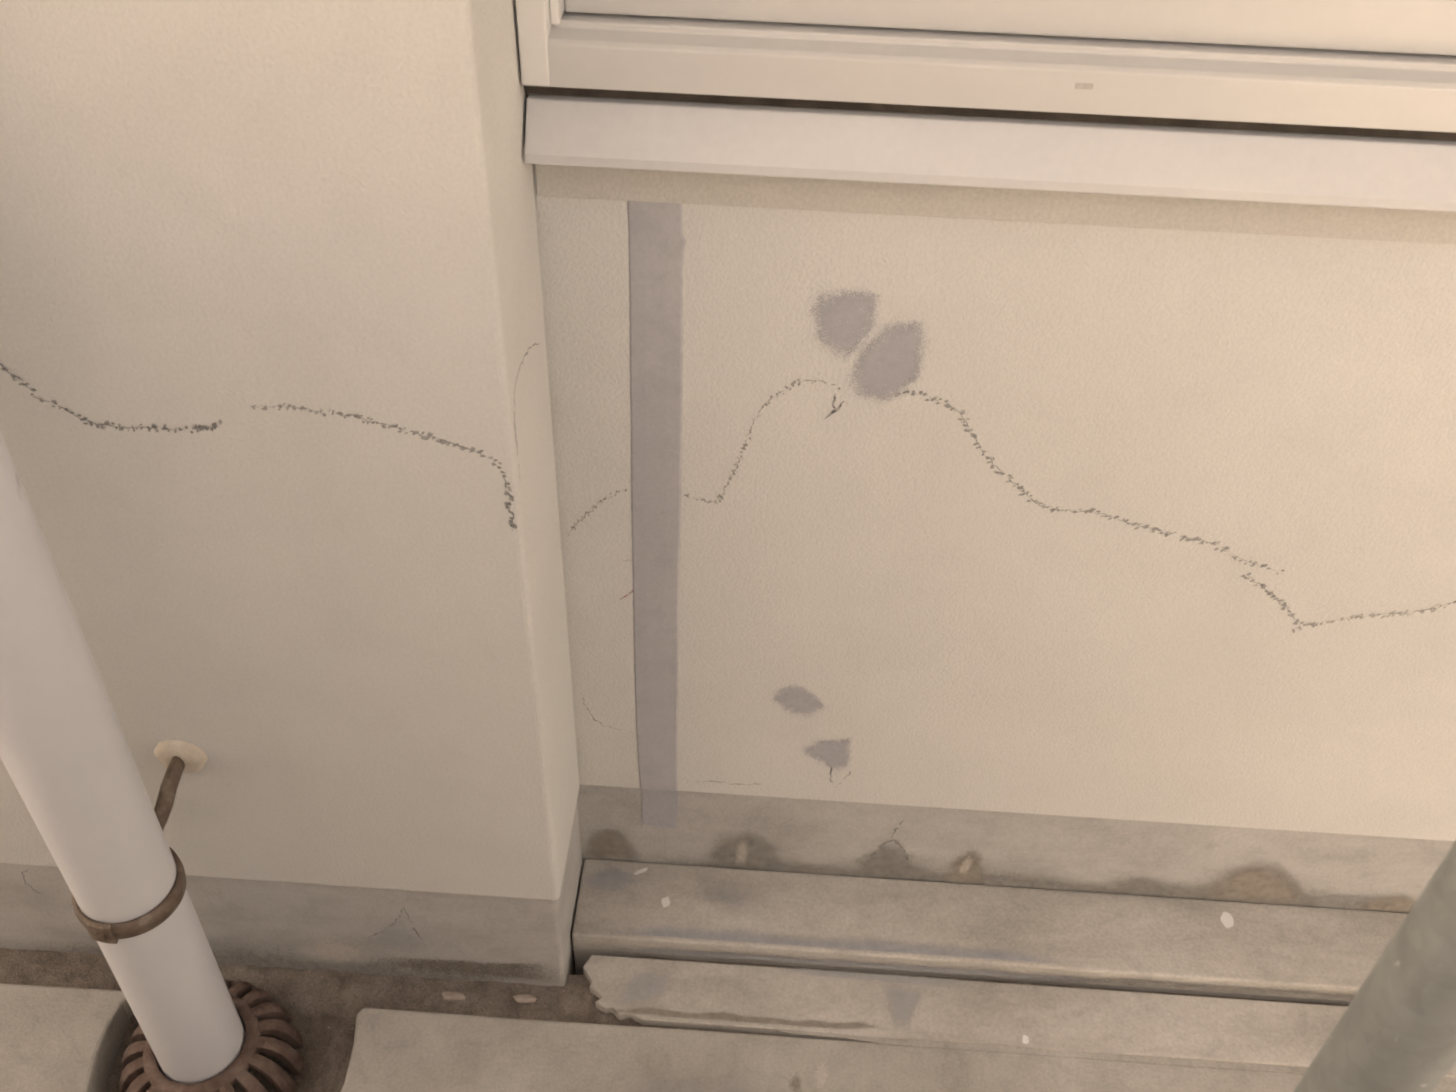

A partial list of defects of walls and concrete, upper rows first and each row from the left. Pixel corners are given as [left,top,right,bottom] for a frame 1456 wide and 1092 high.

crack [0,343,539,531]
crack [684,380,841,503]
crack [895,390,1445,633]